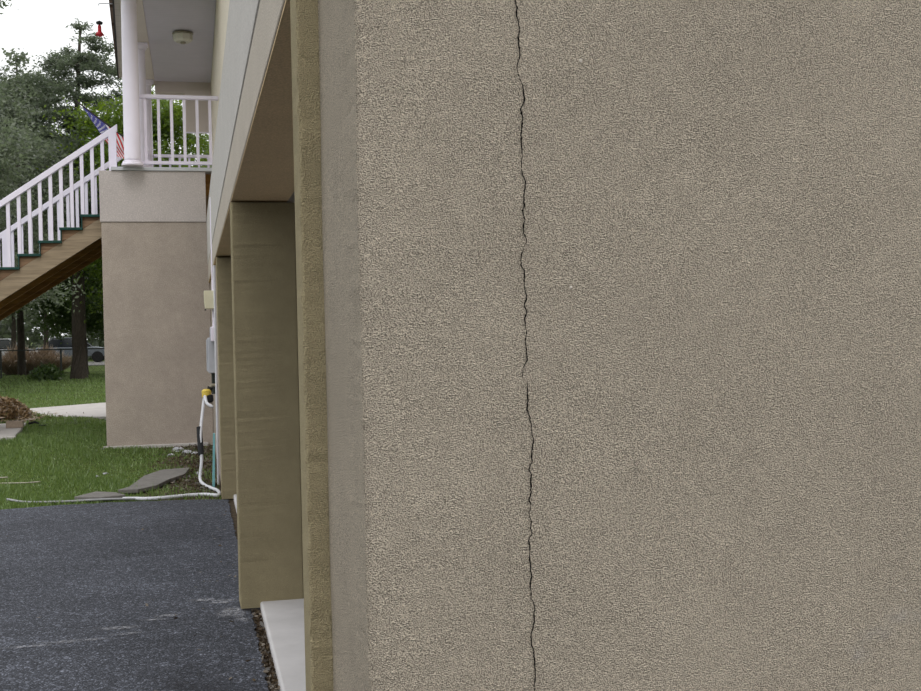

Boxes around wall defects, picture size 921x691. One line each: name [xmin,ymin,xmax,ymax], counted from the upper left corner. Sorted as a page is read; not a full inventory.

crack [515,0,536,691]